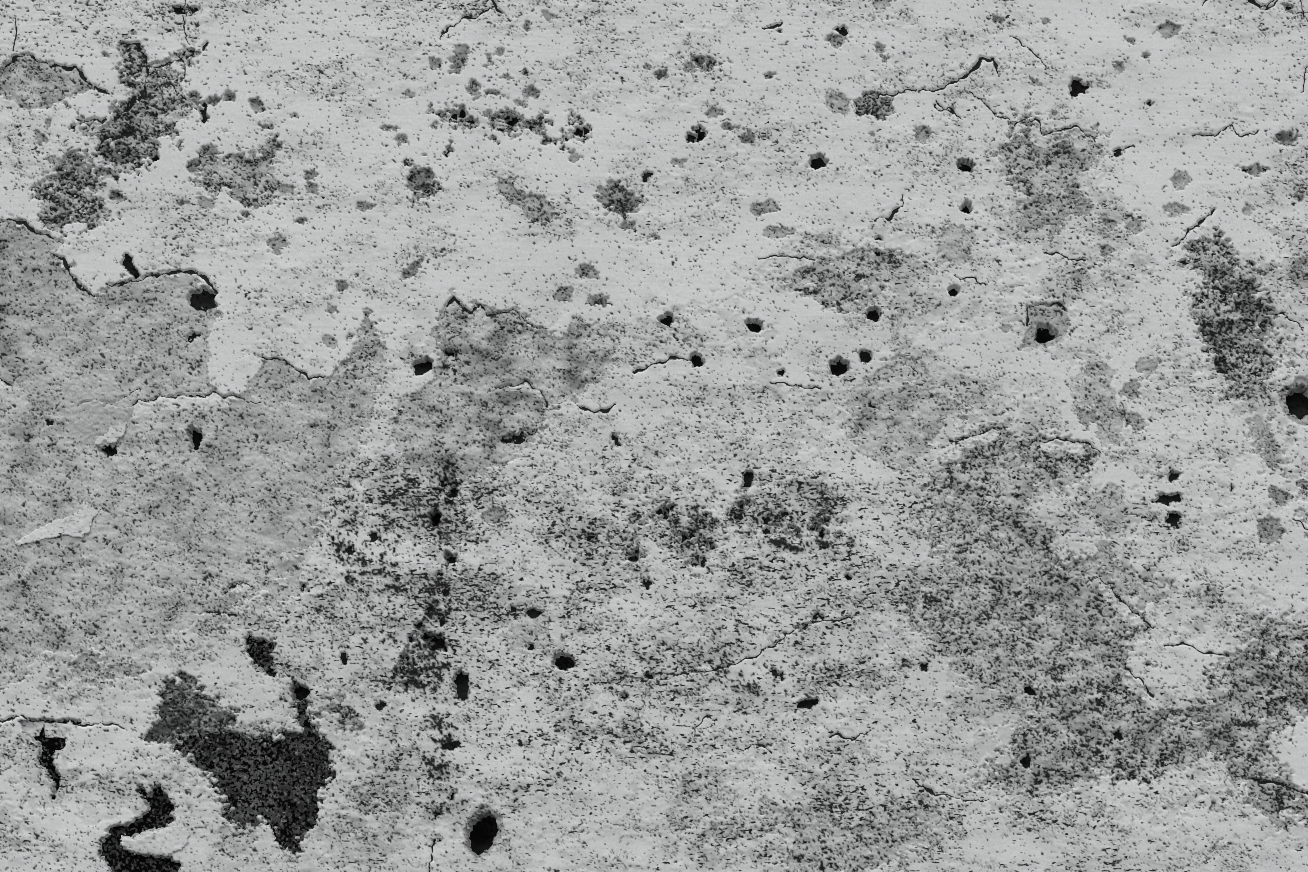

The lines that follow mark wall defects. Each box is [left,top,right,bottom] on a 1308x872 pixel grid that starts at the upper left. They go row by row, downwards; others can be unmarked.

crack [1248,0,1308,22]
spalling [427,45,592,163]
crack [865,36,1135,157]
peeling [381,126,444,204]
flaking render [498,178,558,226]
flaking render [0,32,386,700]
flaking render [390,264,617,498]
spalling [393,607,445,699]
flaking render [30,719,81,799]
flaking render [144,671,387,854]
spalling [442,733,461,750]
flaking render [100,786,190,872]